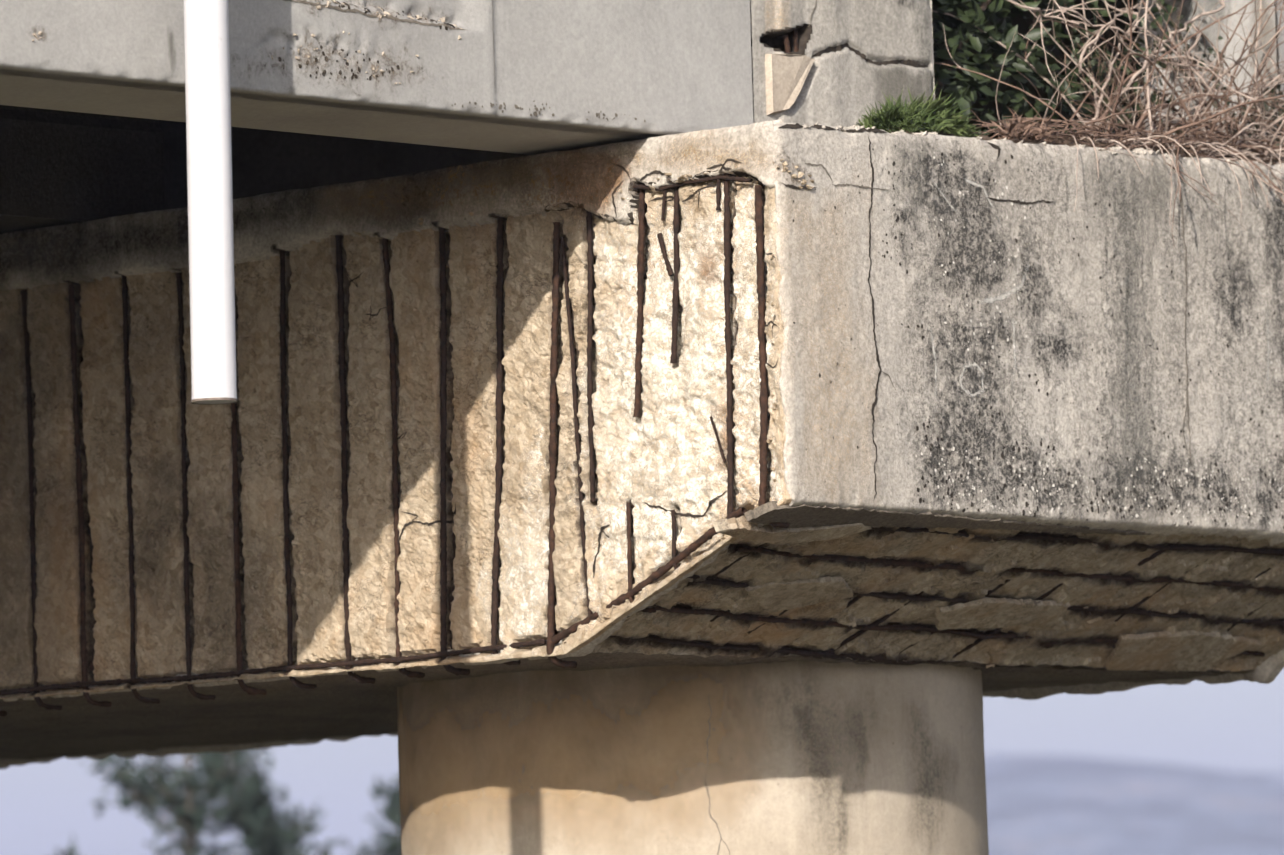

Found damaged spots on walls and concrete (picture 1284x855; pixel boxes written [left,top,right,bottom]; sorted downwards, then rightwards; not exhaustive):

crack [284,0,495,75]
crack [809,0,928,68]
spalling [773,119,938,136]
crack [804,137,897,502]
water stain [894,150,1049,319]
water stain [1216,252,1252,330]
water stain [1266,198,1284,352]
spalling [0,136,1284,716]
water stain [922,312,1240,517]
water stain [1256,455,1284,531]
crack [704,697,730,855]